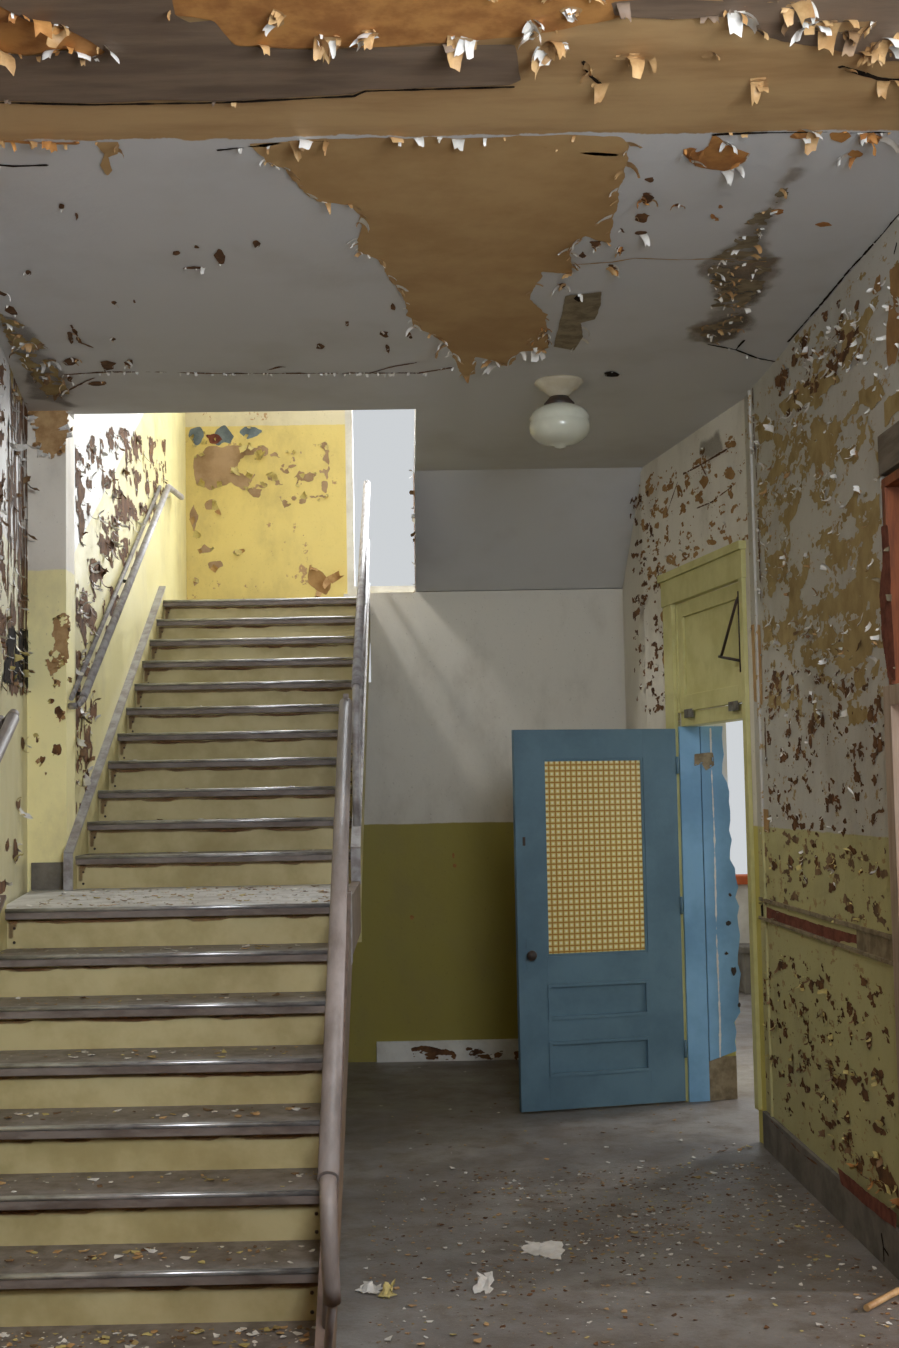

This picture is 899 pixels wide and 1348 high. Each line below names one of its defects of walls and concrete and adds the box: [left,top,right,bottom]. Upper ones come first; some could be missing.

peeling [0,0,899,107]
peeling [0,140,124,175]
peeling [680,136,750,186]
peeling [790,129,899,169]
peeling [173,245,225,274]
peeling [250,135,685,383]
peeling [699,188,789,345]
peeling [189,425,330,586]
peeling [630,260,899,947]
peeling [5,838,23,864]
peeling [16,797,34,819]
flaking render [763,950,899,1229]